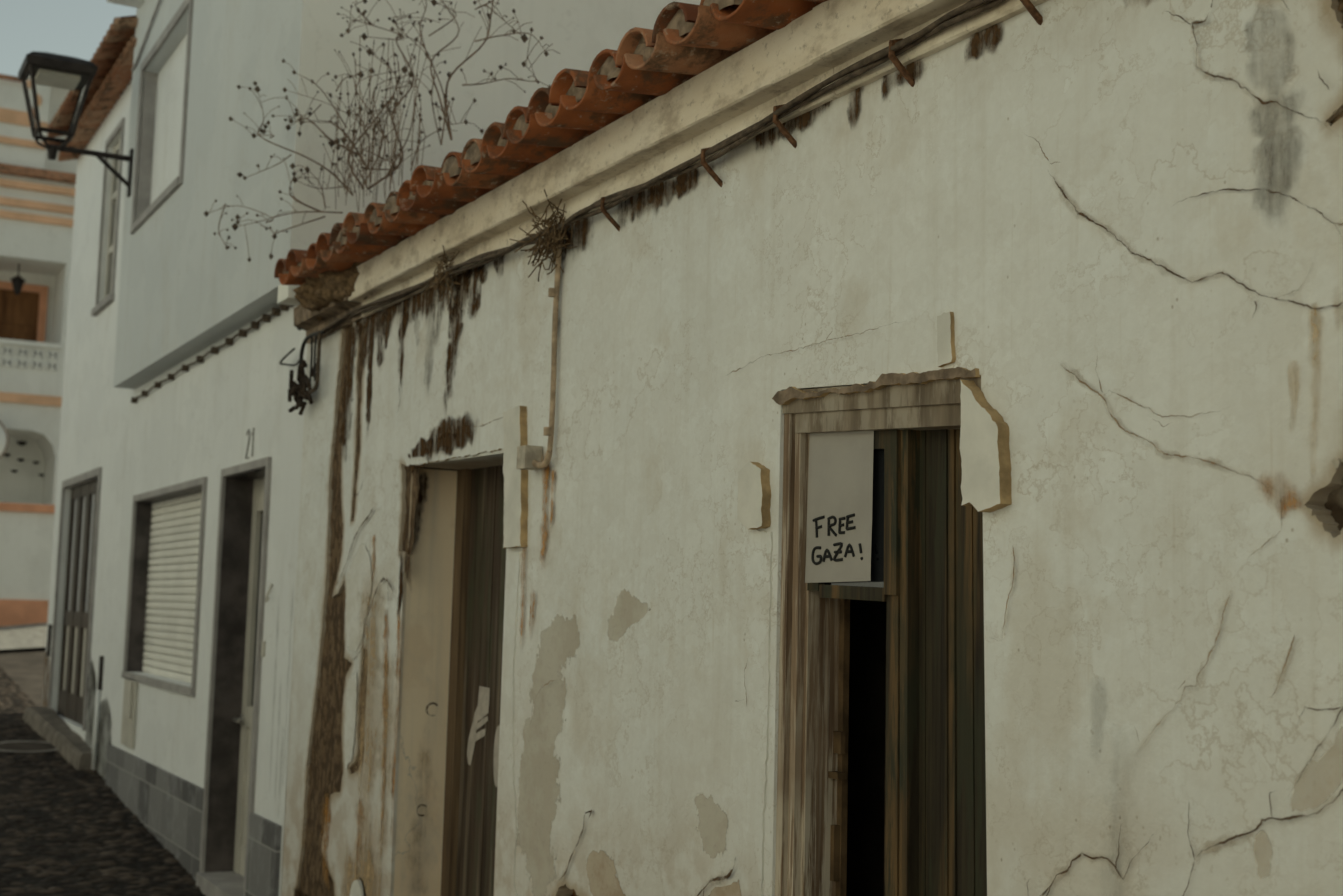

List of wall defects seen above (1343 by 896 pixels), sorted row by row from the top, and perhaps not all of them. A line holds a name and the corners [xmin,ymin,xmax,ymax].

crack [1035,139,1343,318]
water stain [341,255,504,613]
spalling [519,406,528,446]
crack [1067,365,1249,476]
spalling [504,469,528,548]
peeling [608,589,651,641]
spalling [750,462,773,896]
crack [1136,596,1230,737]
peeling [517,615,580,896]
peeling [571,851,625,896]
crack [1027,828,1148,896]
crack [1183,707,1343,896]